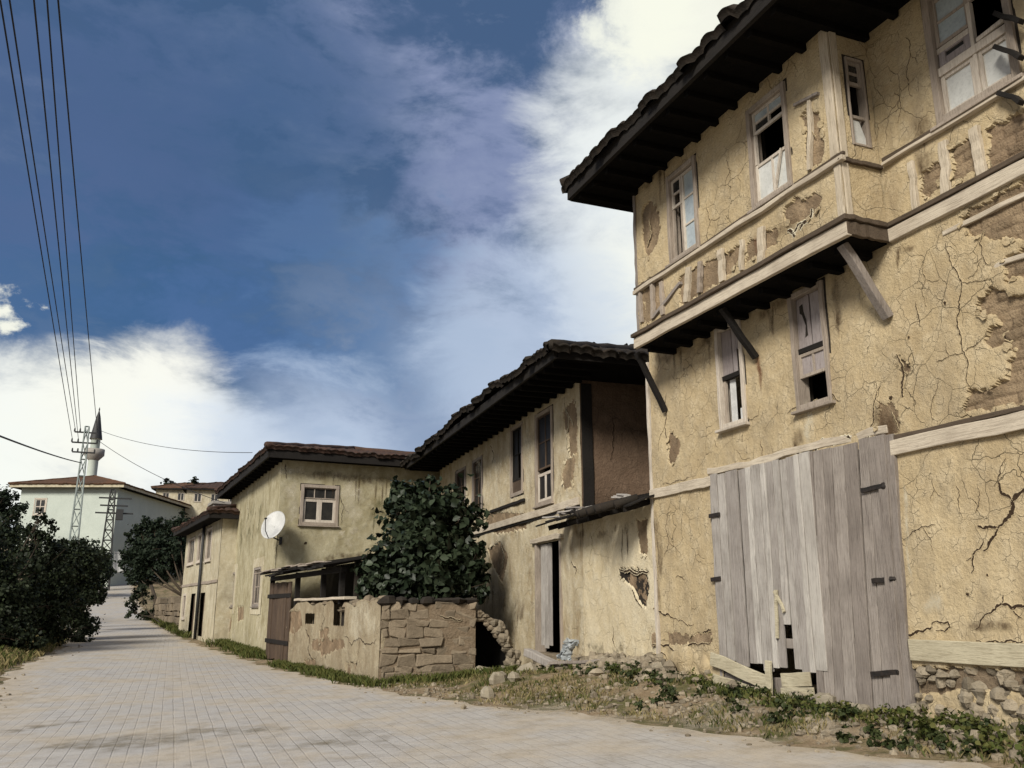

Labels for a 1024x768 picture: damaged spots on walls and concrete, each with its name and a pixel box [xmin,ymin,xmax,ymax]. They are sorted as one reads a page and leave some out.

crack [894,37,918,123]
flaking render [680,193,822,304]
flaking render [957,182,1024,246]
crack [915,230,990,420]
flaking render [957,259,1024,417]
flaking render [561,399,578,491]
flaking render [665,429,681,466]
flaking render [873,402,900,436]
crack [870,353,906,437]
crack [903,458,1024,574]
flaking render [617,517,649,607]
crack [908,595,1024,644]